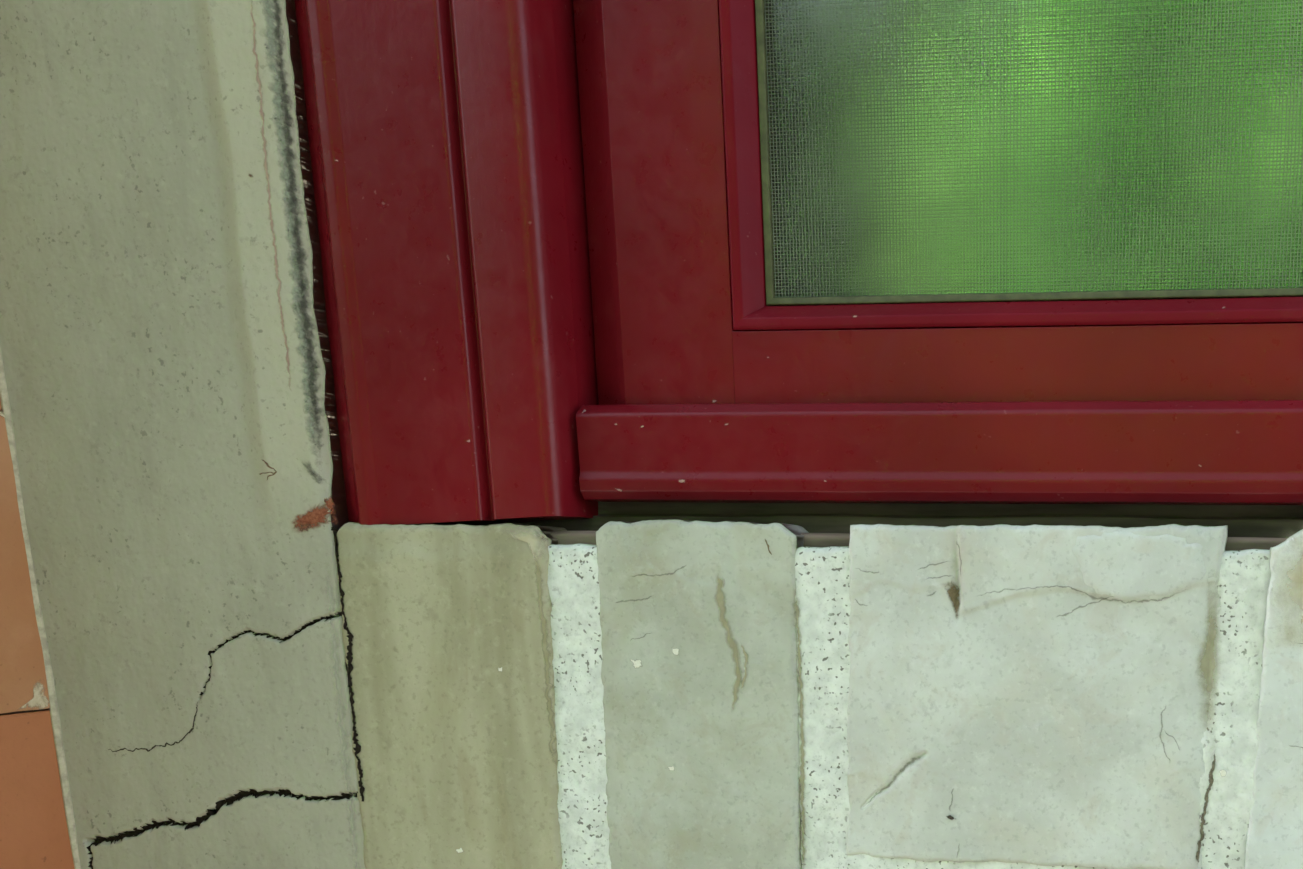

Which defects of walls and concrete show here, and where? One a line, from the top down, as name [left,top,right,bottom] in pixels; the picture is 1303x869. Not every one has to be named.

water stain [266,0,322,445]
crack [86,527,365,869]